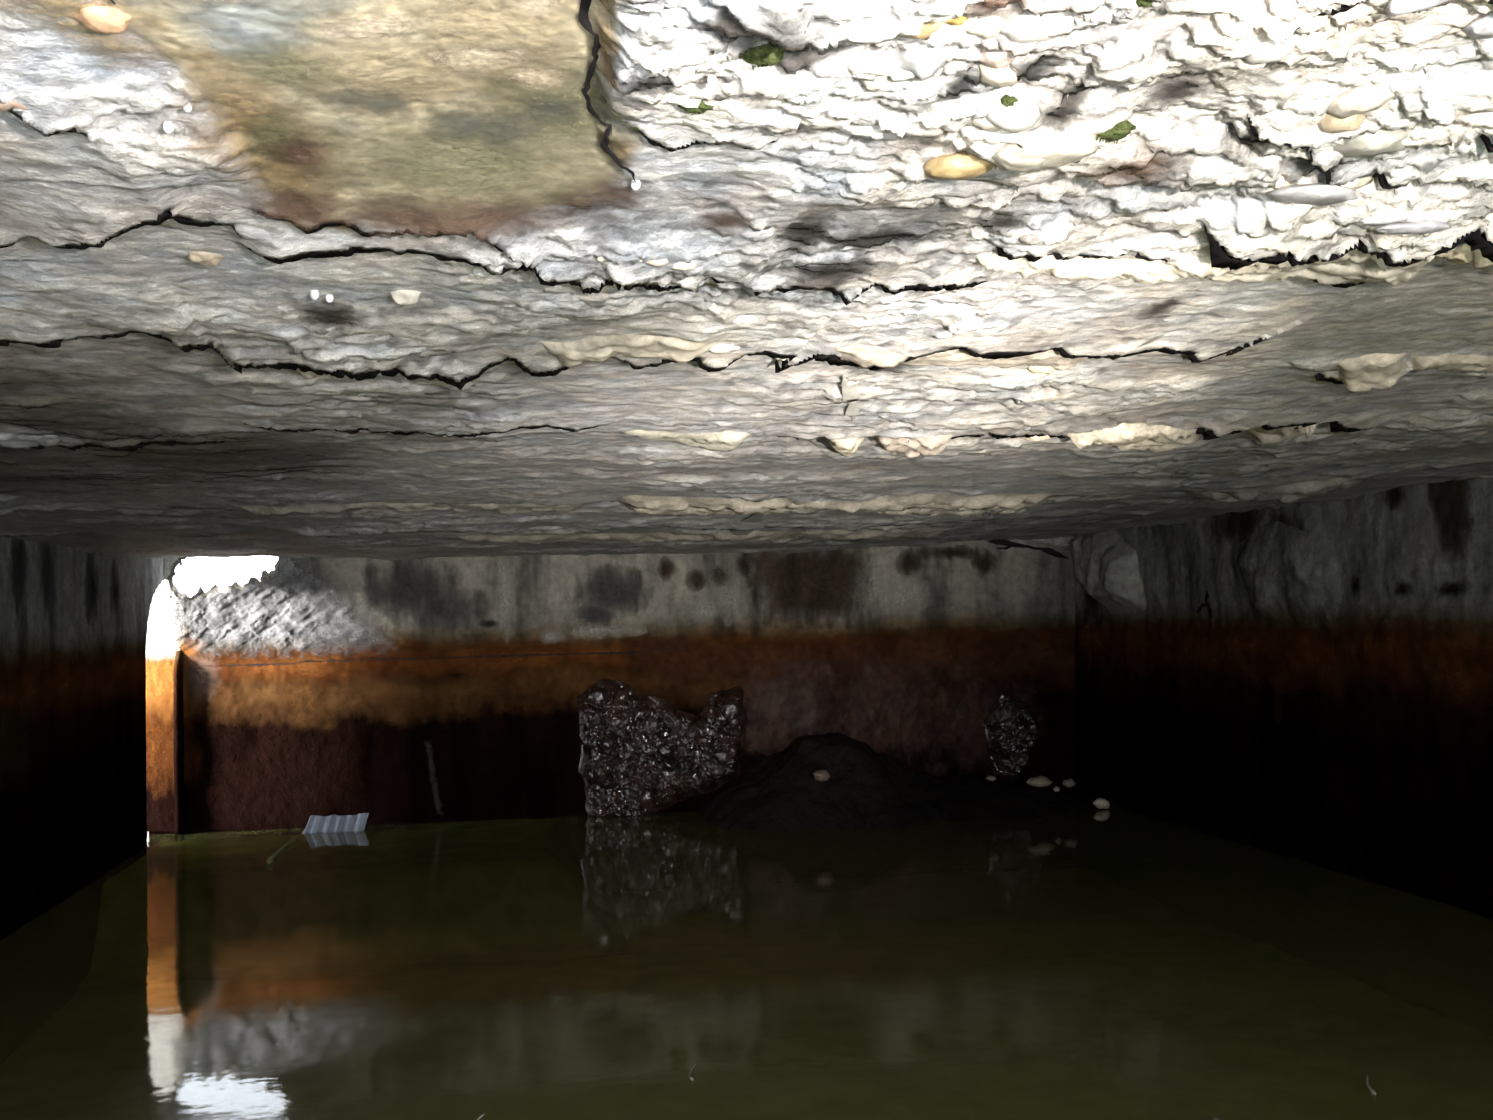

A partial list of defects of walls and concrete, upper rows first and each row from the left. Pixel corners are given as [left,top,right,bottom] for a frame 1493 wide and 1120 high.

peeling [1268,175,1294,189]
peeling [1358,212,1452,234]
crack [0,209,1168,306]
peeling [639,259,697,271]
crack [1204,225,1493,288]
crack [0,331,569,390]
crack [611,338,1270,373]
damp [0,378,321,516]
damp [12,539,119,621]
damp [579,566,642,635]
damp [457,493,1054,620]
rust [187,660,216,694]